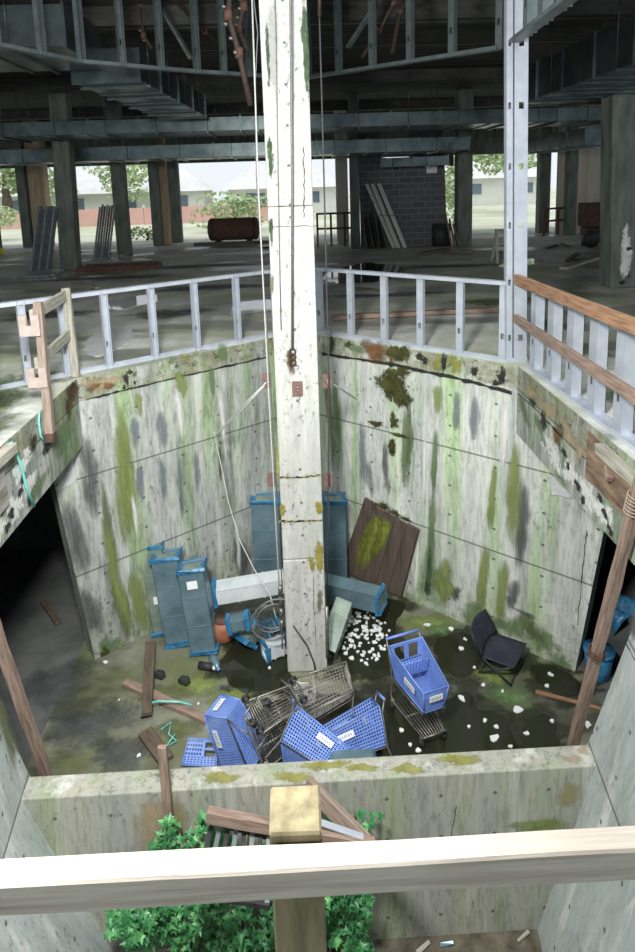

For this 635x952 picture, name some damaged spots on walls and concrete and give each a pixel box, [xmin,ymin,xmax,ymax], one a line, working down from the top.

leakage [300,0,310,97]
peeling [619,223,633,284]
rust [361,339,396,363]
rust [65,377,117,417]
leakage [157,416,167,442]
leakage [175,374,186,434]
leakage [209,370,226,477]
peeling [0,454,39,544]
leakage [63,506,88,563]
leakage [78,395,151,634]
leakage [465,404,528,625]
peeling [537,429,614,536]